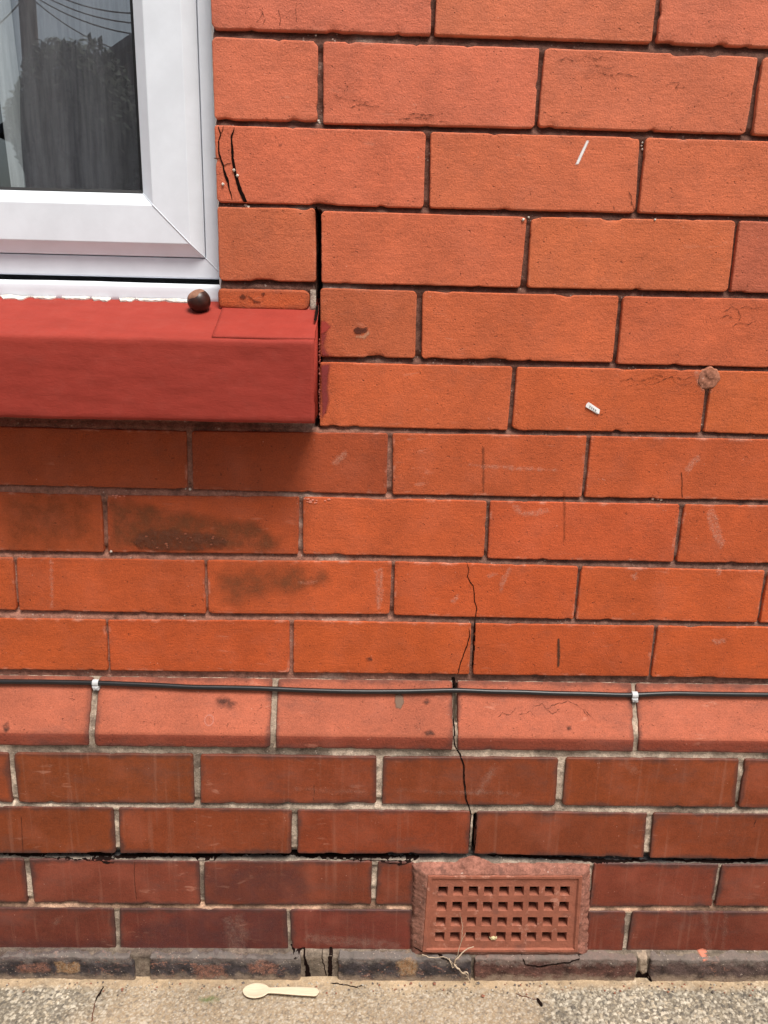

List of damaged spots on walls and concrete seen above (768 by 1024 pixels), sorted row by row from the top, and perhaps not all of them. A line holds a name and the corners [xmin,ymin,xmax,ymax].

crack [214,126,247,202]
crack [314,207,322,321]
crack [451,564,477,688]
crack [452,717,765,864]
crack [3,818,419,900]
crack [291,944,362,988]